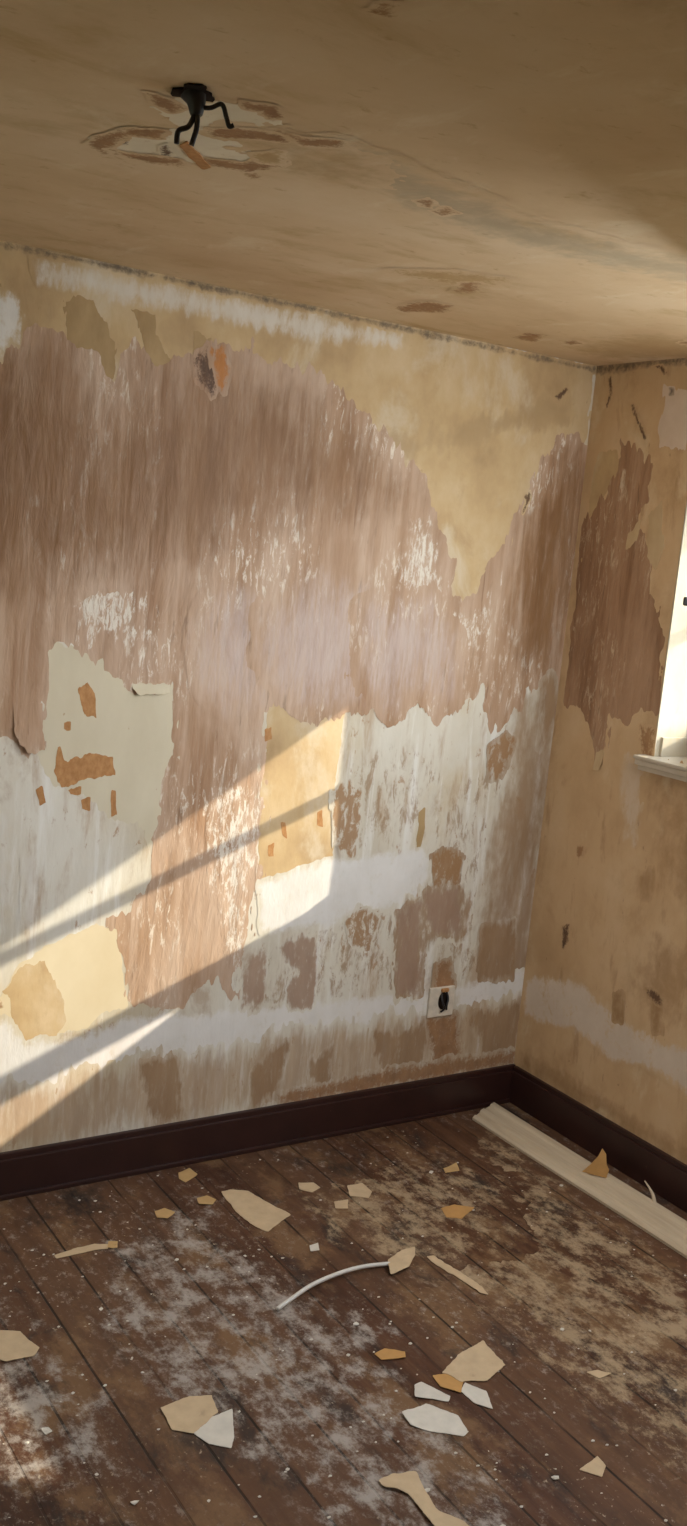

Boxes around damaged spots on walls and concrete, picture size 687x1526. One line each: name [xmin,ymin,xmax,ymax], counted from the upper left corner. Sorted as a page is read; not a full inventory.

peeling [83,90,348,180]
peeling [63,295,117,379]
peeling [131,309,170,367]
peeling [13,510,503,848]
peeling [198,769,287,974]
peeling [0,961,66,1041]